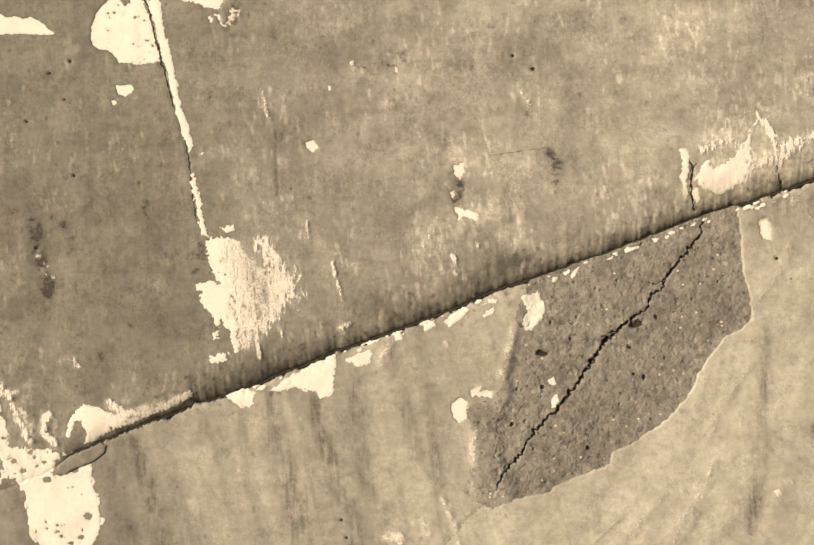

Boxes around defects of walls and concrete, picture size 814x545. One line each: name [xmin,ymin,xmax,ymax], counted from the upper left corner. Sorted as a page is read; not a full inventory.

peeling [0,14,54,35]
peeling [91,0,194,152]
crack [144,0,196,217]
peeling [182,0,240,27]
peeling [189,172,249,364]
peeling [450,190,477,221]
crack [497,161,703,487]
spalling [451,206,752,509]
peeling [679,120,758,203]
leakage [699,118,743,154]
leakage [750,111,814,178]
flaking render [0,389,105,545]